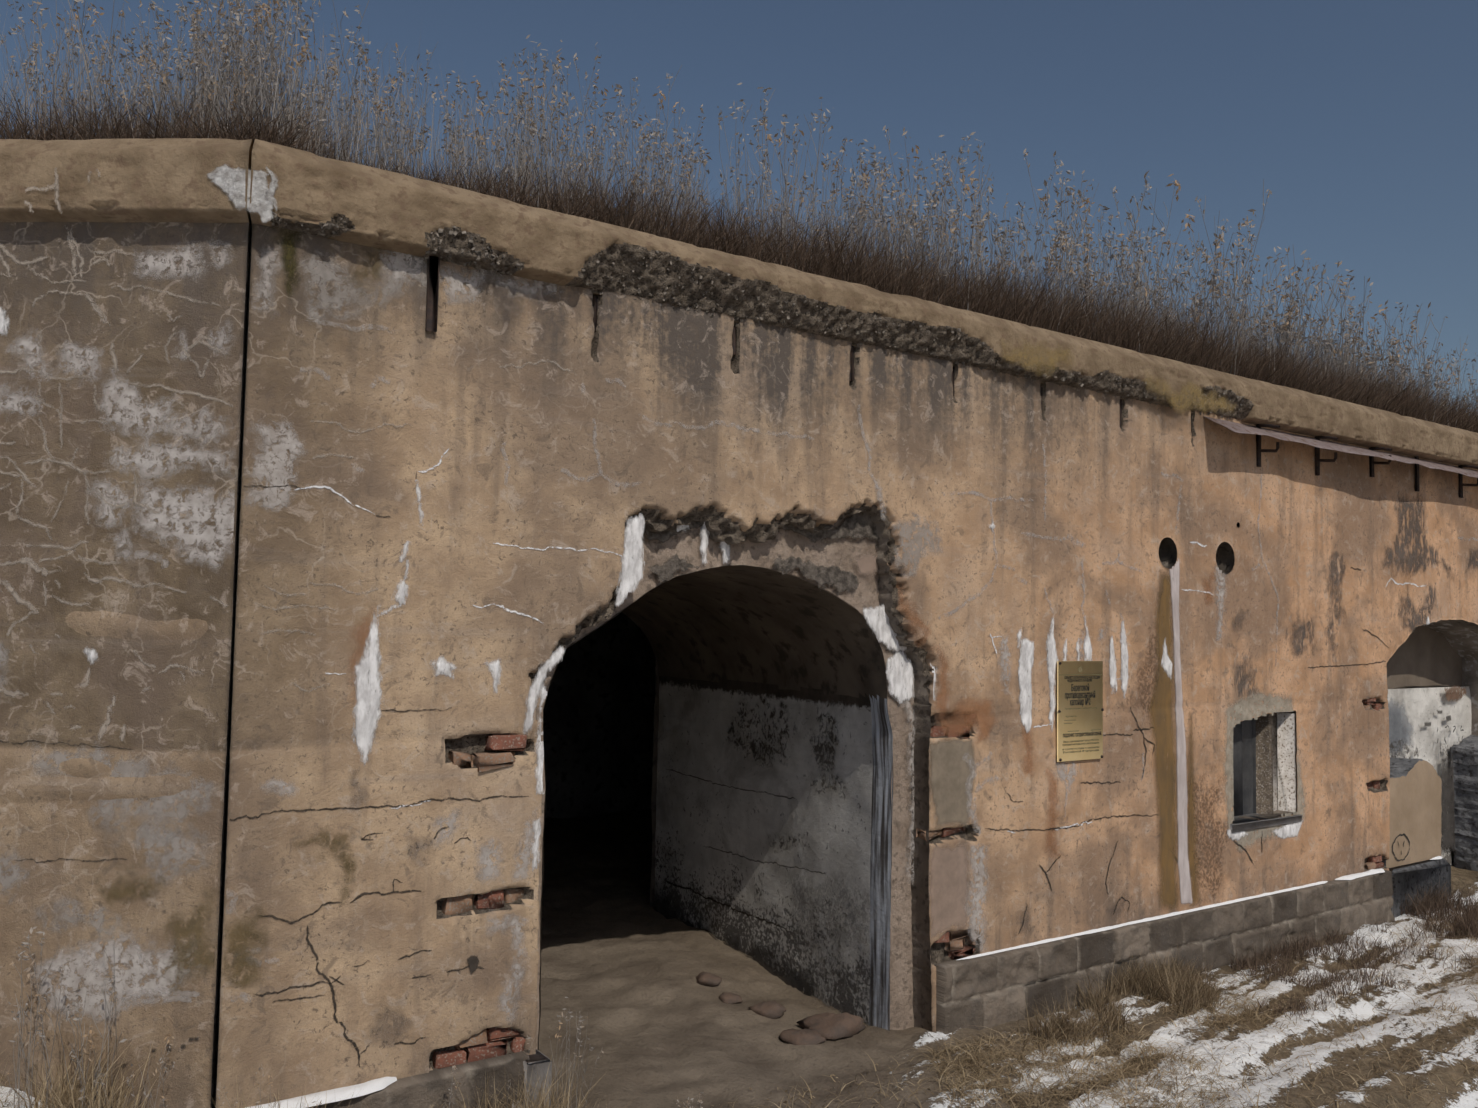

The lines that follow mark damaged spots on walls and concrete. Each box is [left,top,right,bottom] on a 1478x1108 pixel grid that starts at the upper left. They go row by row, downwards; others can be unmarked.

spalling [565,242,1254,420]
crack [0,169,230,653]
spalling [528,587,636,692]
crack [0,652,200,750]
spalling [445,733,535,772]
spalling [625,501,982,965]
spalling [1366,778,1388,793]
peeling [1425,686,1466,726]
spalling [436,887,534,919]
crack [256,879,484,1067]
spalling [429,1027,530,1070]